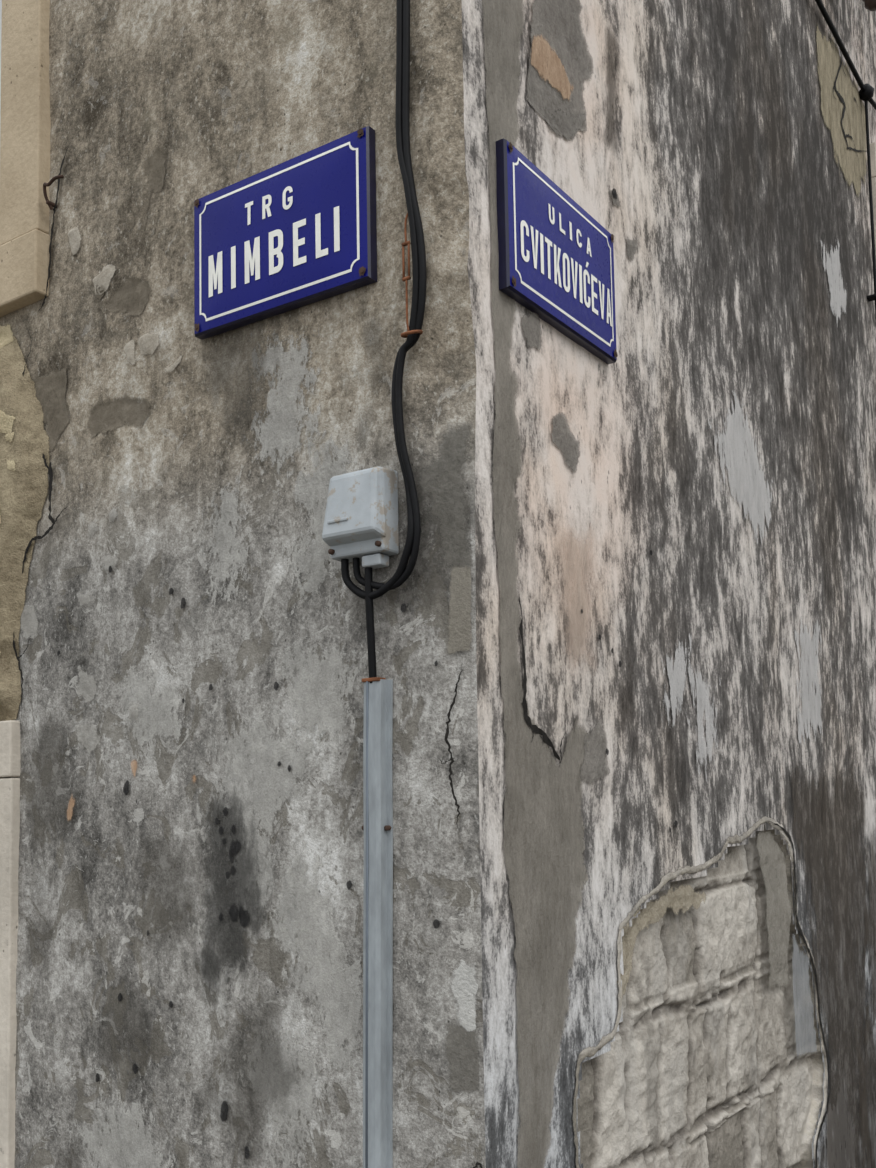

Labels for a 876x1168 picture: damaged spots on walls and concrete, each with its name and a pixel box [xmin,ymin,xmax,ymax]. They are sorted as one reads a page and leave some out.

flaking render [610,188,621,207]
flaking render [627,238,638,260]
leakage [821,240,847,323]
crack [22,454,67,573]
peeling [482,0,610,1168]
leakage [706,391,774,543]
crack [13,633,31,734]
leakage [187,328,378,1168]
crack [438,666,462,828]
crack [519,596,567,764]
leakage [661,633,721,781]
spalling [573,816,828,1168]